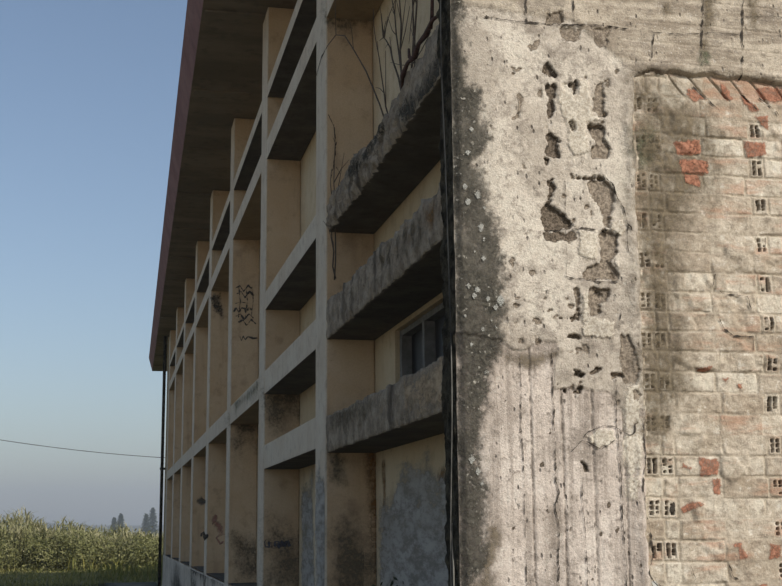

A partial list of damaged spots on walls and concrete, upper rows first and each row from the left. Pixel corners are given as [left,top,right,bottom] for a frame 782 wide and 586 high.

crack [485,0,628,29]
crack [652,0,778,114]
flaking render [538,62,619,165]
flaking render [721,84,782,129]
flaking render [674,139,708,187]
flaking render [744,141,766,157]
leakage [451,0,558,586]
crack [551,353,660,586]
flaking render [683,457,721,494]
flaking render [681,502,704,513]
flaking render [769,543,781,559]